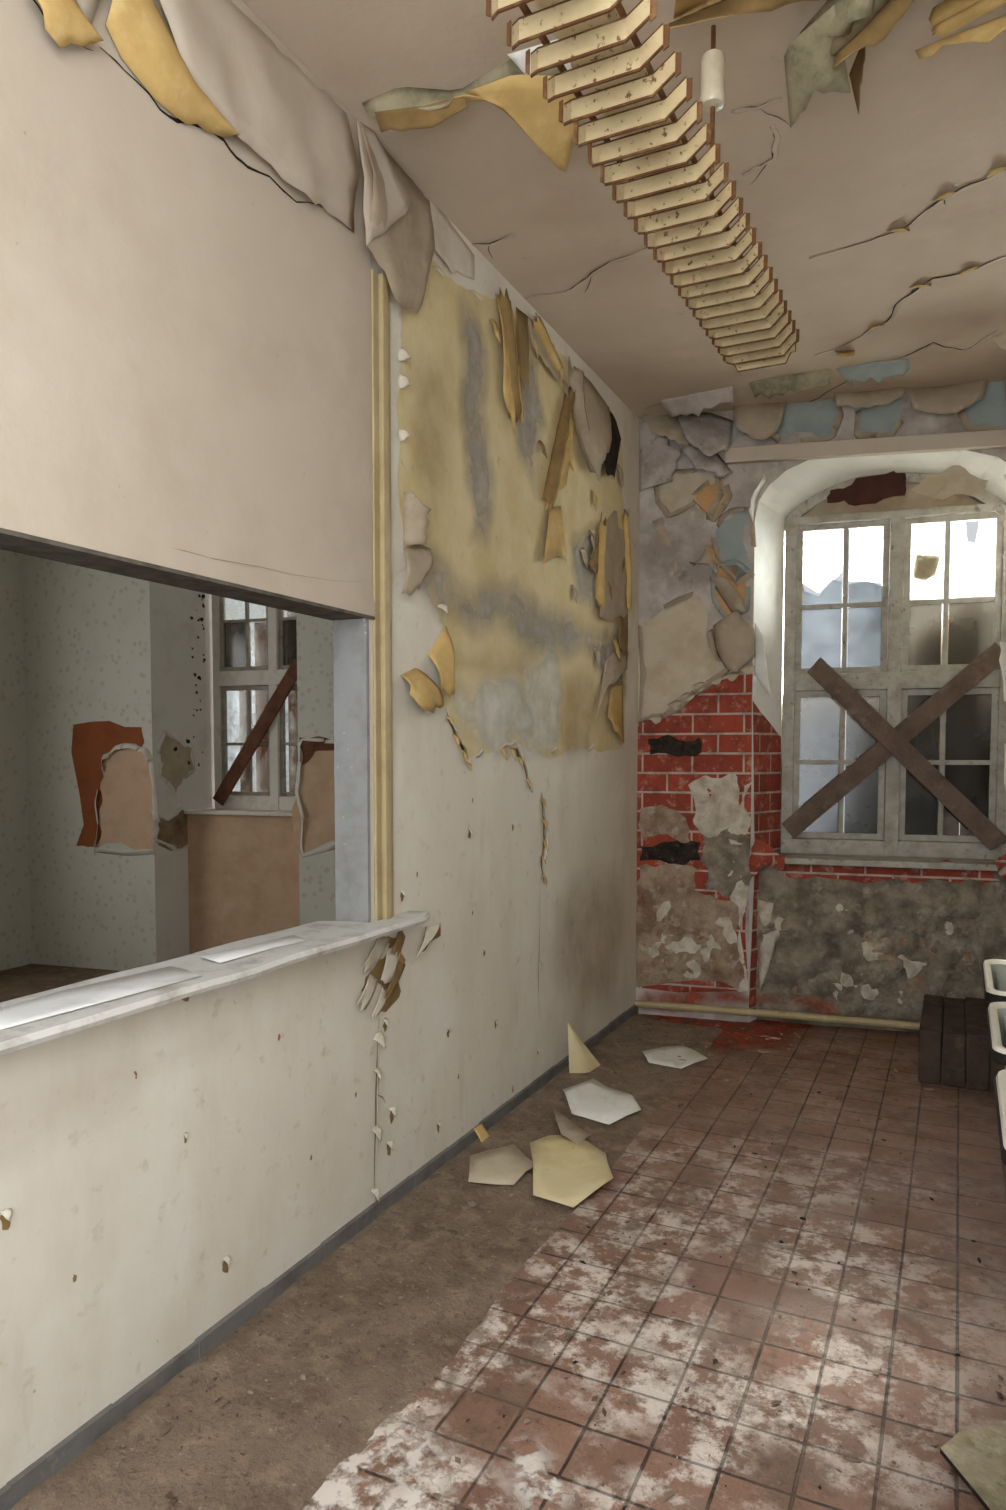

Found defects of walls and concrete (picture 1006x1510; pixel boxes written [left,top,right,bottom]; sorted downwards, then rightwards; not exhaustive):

crack [809,167,1006,259]
crack [810,256,1006,403]
peeling [33,0,1006,1032]